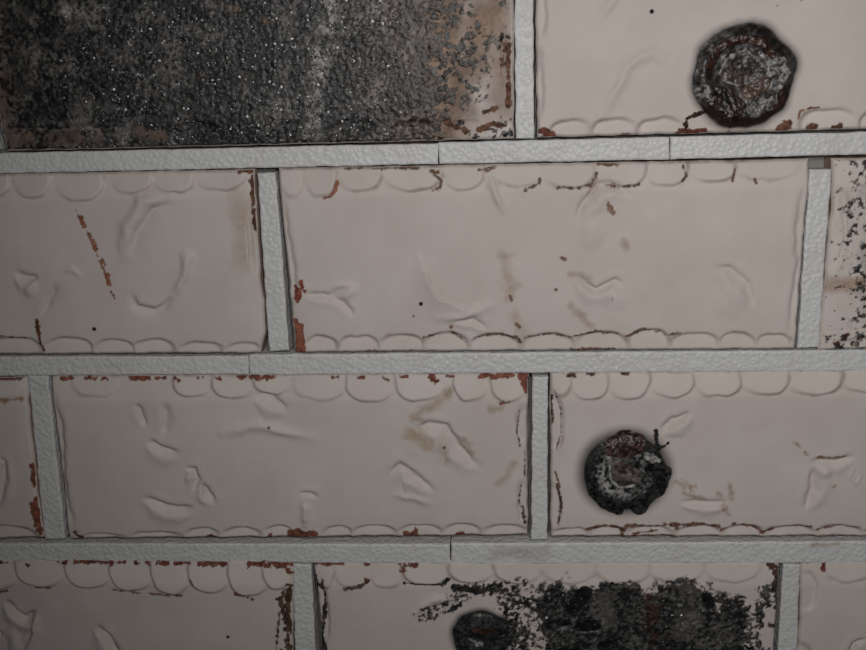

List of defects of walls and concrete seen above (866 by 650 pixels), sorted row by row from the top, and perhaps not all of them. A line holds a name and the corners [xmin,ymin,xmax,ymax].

spalling [443,43,512,135]
spalling [766,563,778,593]
spalling [558,586,601,631]